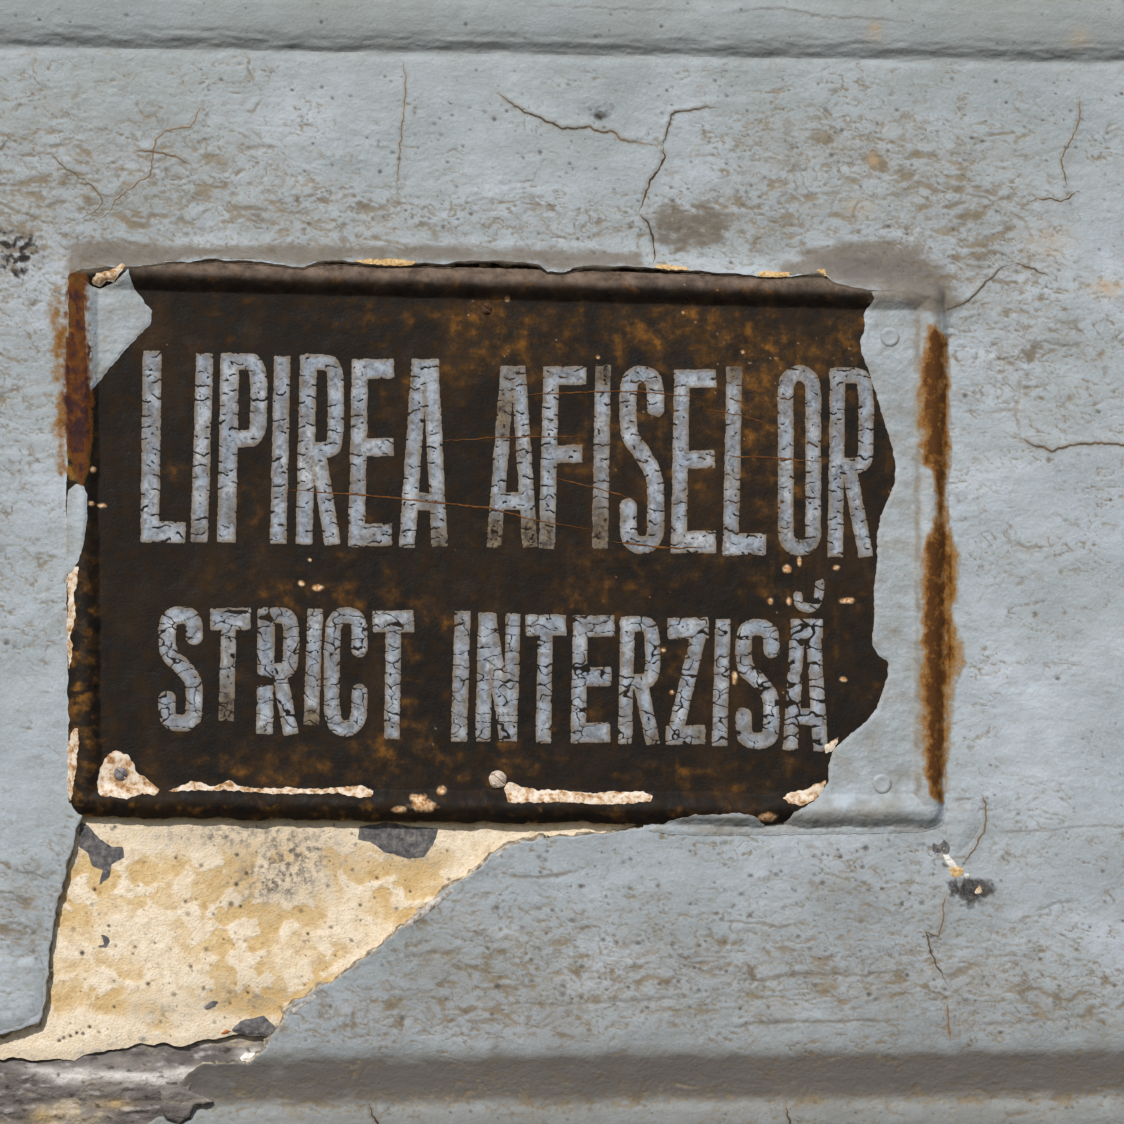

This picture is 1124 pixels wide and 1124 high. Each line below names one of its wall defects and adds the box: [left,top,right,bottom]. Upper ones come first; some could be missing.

crack [497,92,719,262]
crack [1028,104,1081,202]
rust [51,273,93,485]
peeling [84,269,152,390]
crack [1021,438,1123,452]
rust [918,325,965,804]
flaking render [0,289,993,1124]
crack [963,794,987,865]
crack [926,892,951,1040]